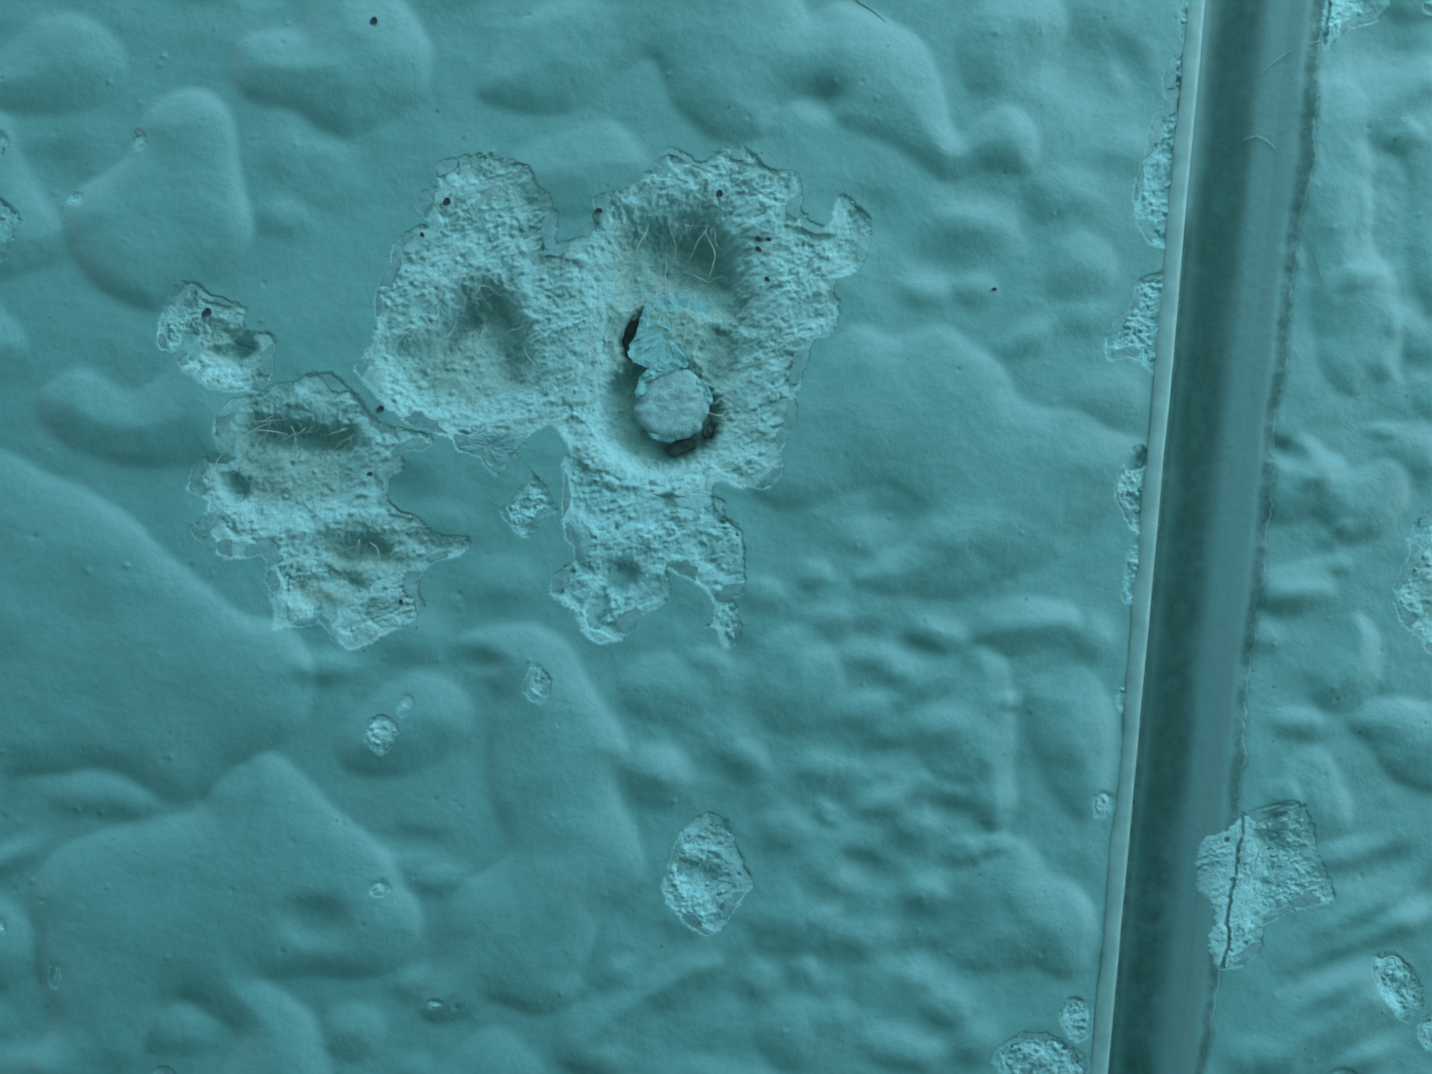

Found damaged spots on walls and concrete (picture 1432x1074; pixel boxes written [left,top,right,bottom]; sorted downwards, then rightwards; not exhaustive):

peeling [1321,0,1391,49]
peeling [1132,0,1189,249]
peeling [0,201,21,261]
peeling [1103,271,1164,375]
spalling [157,145,873,650]
peeling [1393,510,1432,653]
peeling [661,812,754,936]
peeling [1194,801,1334,969]
peeling [991,997,1095,1074]
peeling [1371,955,1432,1050]